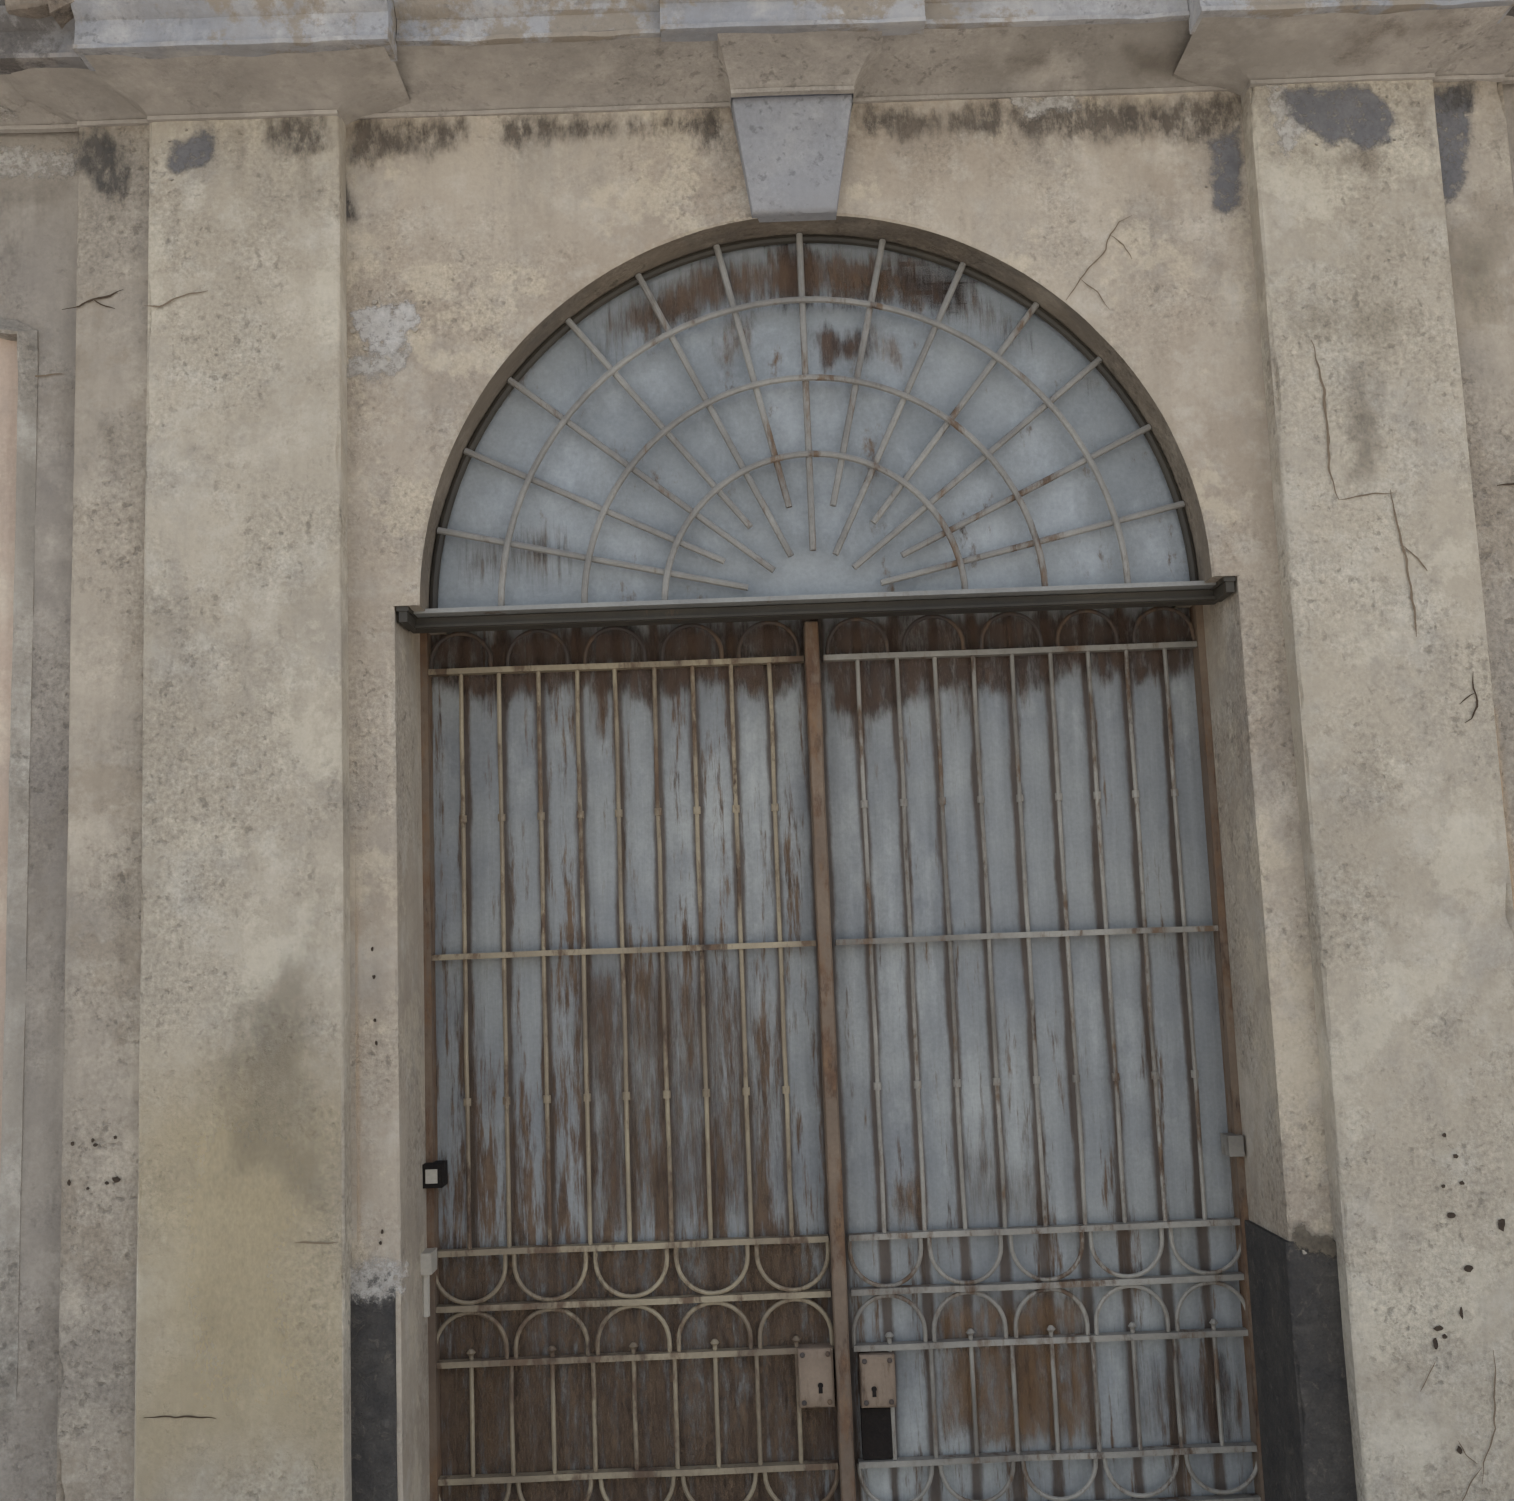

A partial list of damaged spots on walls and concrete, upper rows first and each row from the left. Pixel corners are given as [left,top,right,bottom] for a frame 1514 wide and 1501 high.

damp [75,130,130,197]
damp [504,120,610,144]
damp [663,109,718,146]
damp [864,96,1242,141]
damp [1265,84,1309,153]
crack [1066,215,1132,310]
crack [1311,340,1428,637]